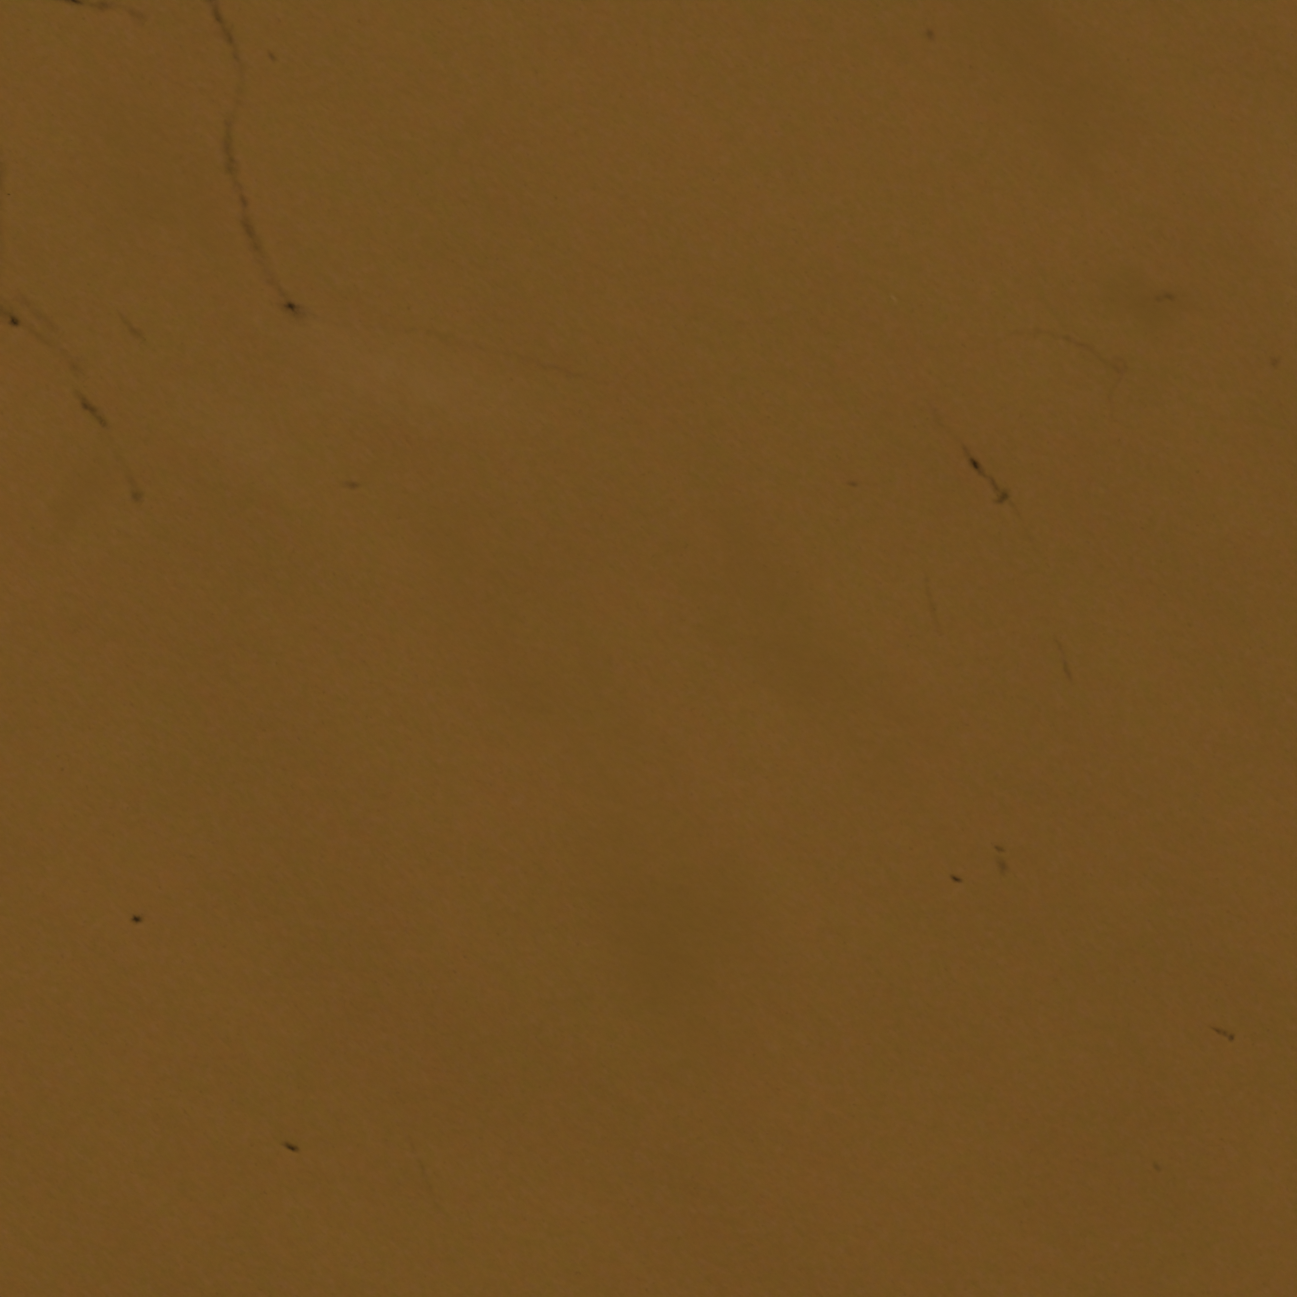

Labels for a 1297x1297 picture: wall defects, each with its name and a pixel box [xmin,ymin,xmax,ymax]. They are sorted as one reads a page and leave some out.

crack [13,0,149,28]
crack [199,0,321,329]
crack [922,393,1047,561]